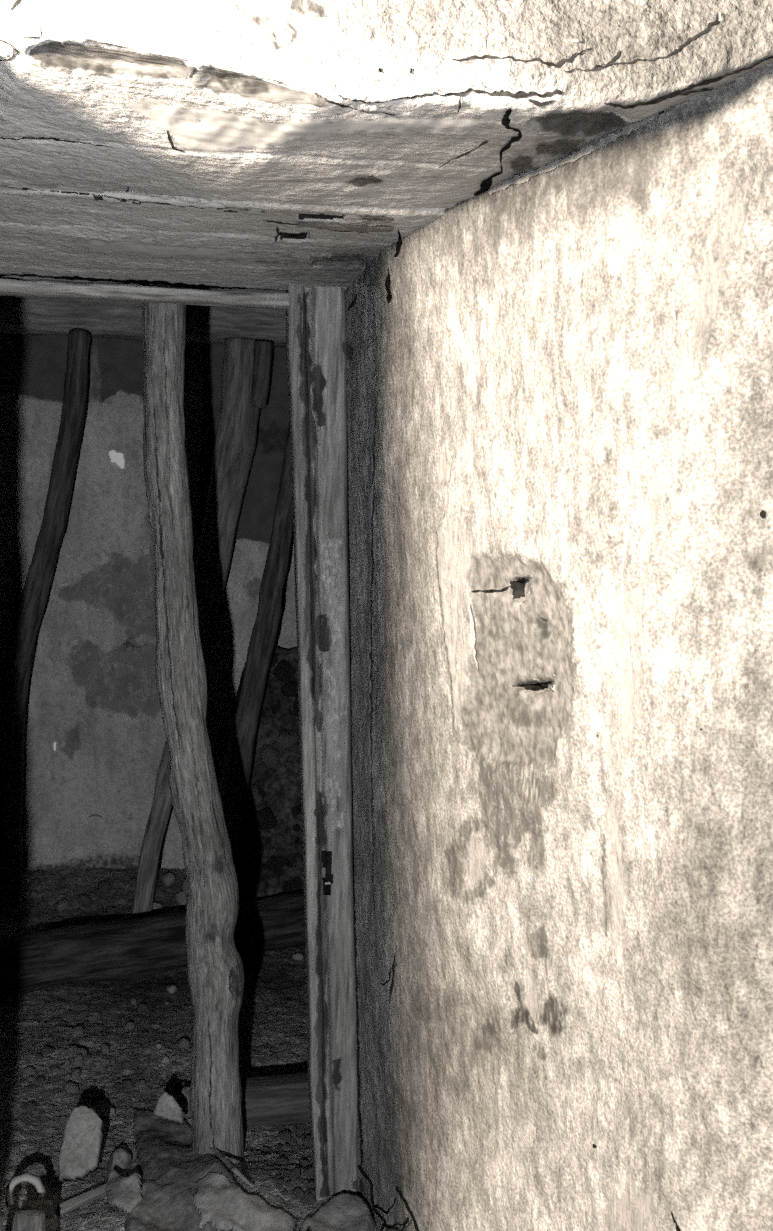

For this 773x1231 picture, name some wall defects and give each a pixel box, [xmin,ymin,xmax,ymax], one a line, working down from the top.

crack [313,13,721,196]
crack [604,56,773,109]
leakage [59,548,161,716]
leakage [445,754,556,902]
leakage [531,927,547,957]